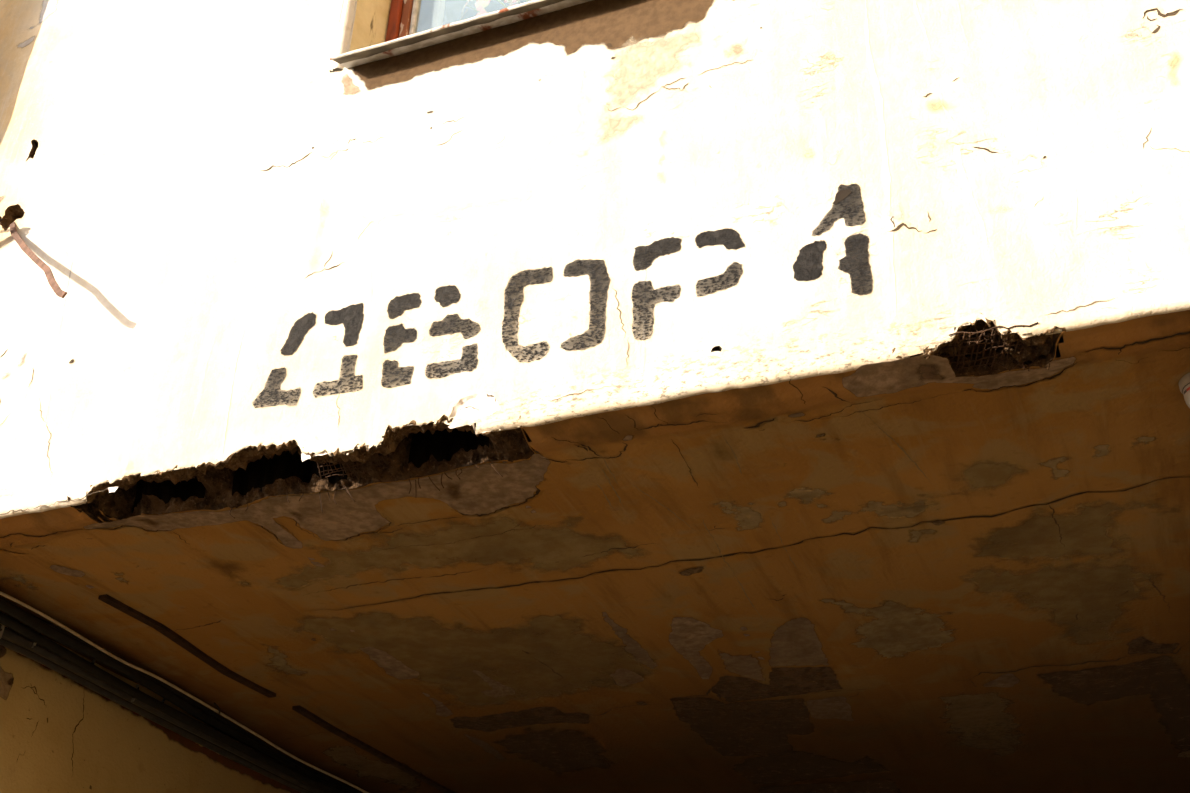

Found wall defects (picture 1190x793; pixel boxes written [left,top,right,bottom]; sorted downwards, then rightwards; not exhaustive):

crack [607,60,751,112]
crack [261,137,384,171]
crack [1143,128,1190,153]
crack [548,285,629,401]
spalling [842,313,1076,397]
crack [1048,298,1115,315]
crack [29,369,51,471]
spalling [67,390,551,567]
crack [254,331,1190,547]
crack [0,488,190,554]
crack [306,477,1190,611]